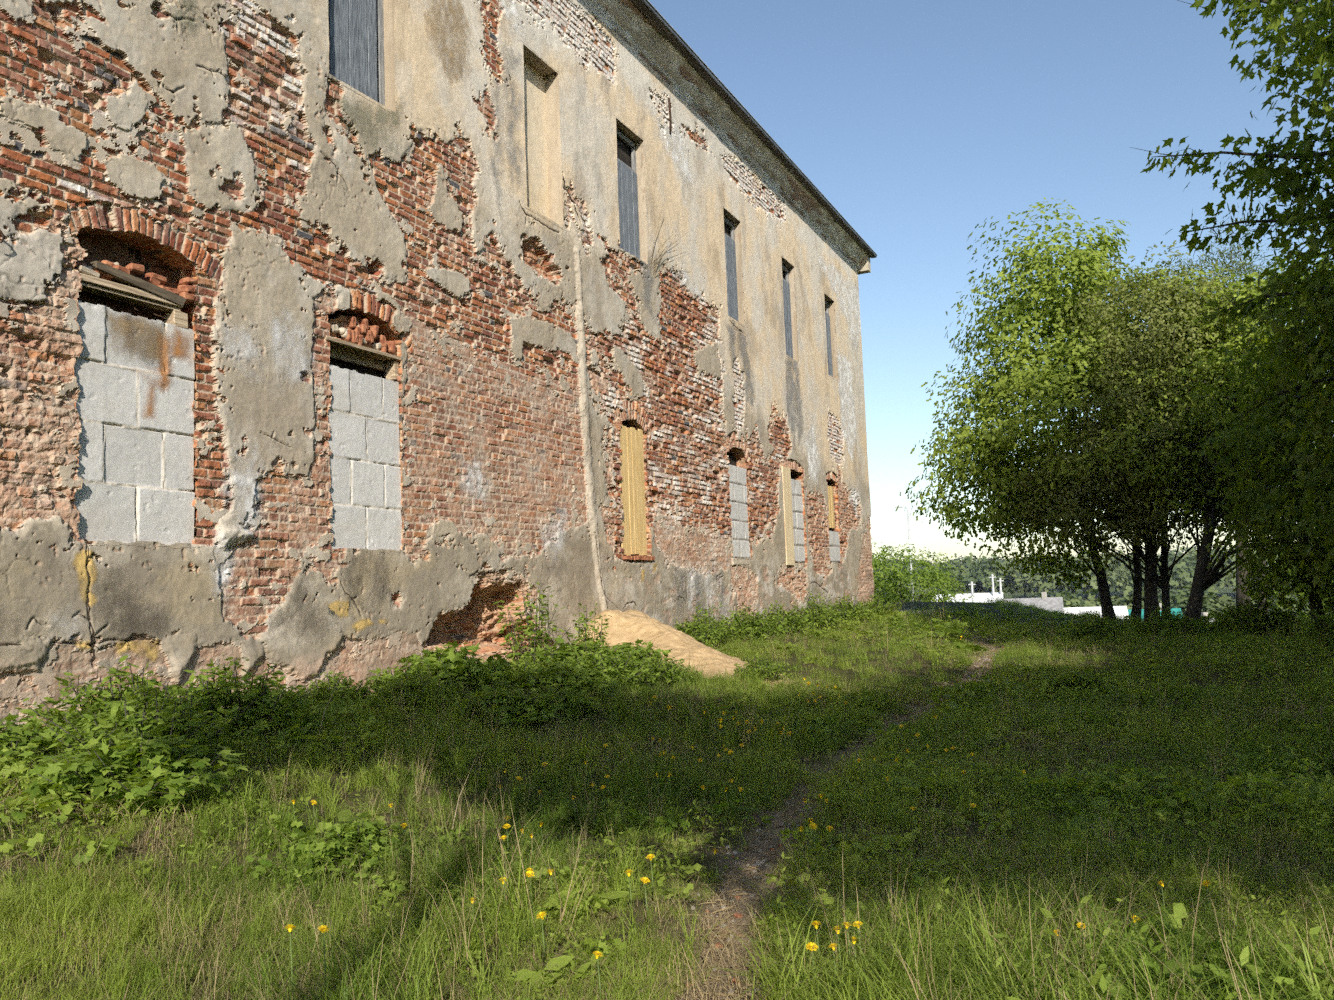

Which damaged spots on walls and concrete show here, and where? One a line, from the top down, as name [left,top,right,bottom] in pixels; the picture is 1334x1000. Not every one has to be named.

spalling [0,0,794,737]
crack [0,546,154,666]
spalling [774,407,875,608]